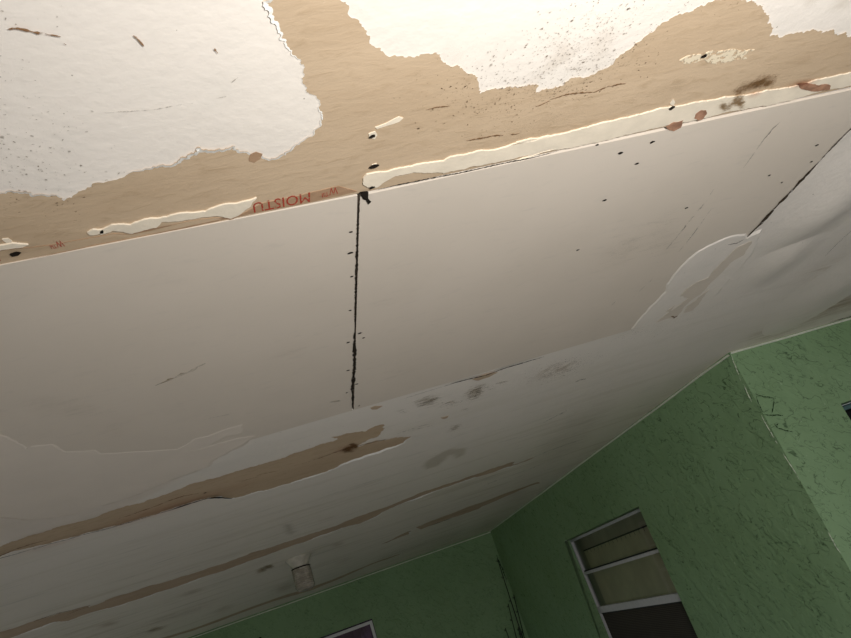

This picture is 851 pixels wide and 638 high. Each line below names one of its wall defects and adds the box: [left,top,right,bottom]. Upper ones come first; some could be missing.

peeling [0,0,851,264]
peeling [0,424,411,558]
peeling [0,457,539,638]